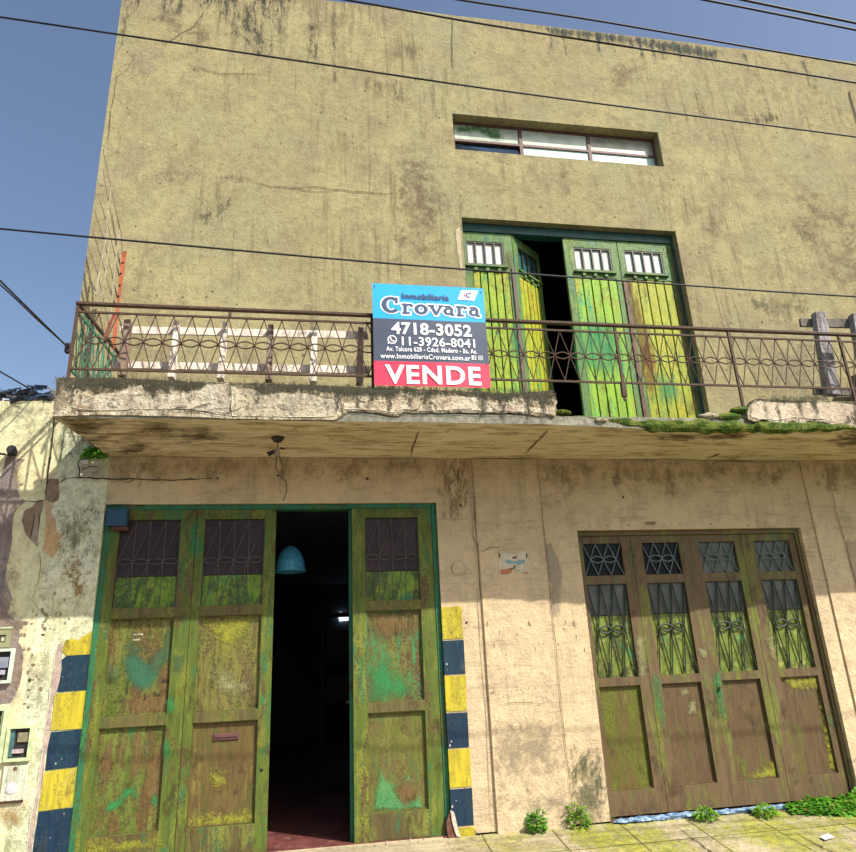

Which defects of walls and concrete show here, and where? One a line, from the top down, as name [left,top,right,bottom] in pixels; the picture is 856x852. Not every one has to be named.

water stain [226,0,283,54]
water stain [548,27,717,57]
crack [247,179,387,194]
peeling [71,382,420,417]
peeling [432,395,480,411]
peeling [491,399,553,414]
water stain [46,416,111,456]
water stain [653,432,745,441]
water stain [827,407,856,450]
crack [30,420,227,502]
crack [626,453,768,463]
peeling [0,456,70,852]